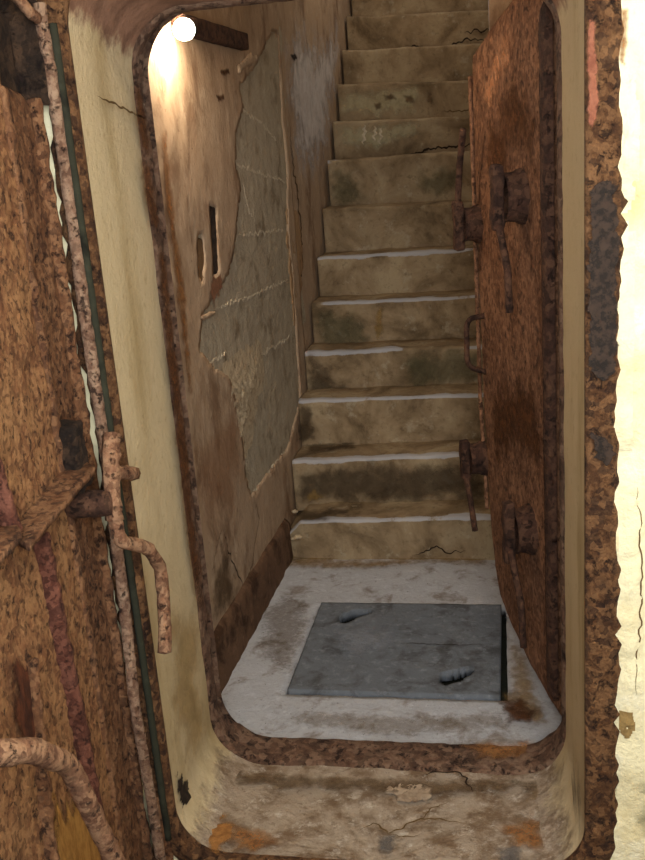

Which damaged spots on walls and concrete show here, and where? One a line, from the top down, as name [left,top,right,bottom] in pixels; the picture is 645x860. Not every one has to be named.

leakage [291,34,337,165]
corrosion [485,46,509,105]
corrosion [135,84,158,227]
spalling [198,206,222,303]
corrosion [160,132,203,604]
corrosion [493,377,540,461]
corrosion [476,741,530,758]
corrosion [177,773,191,805]
corrosion [52,793,101,860]
corrosion [209,814,274,852]
corrosion [505,822,542,847]